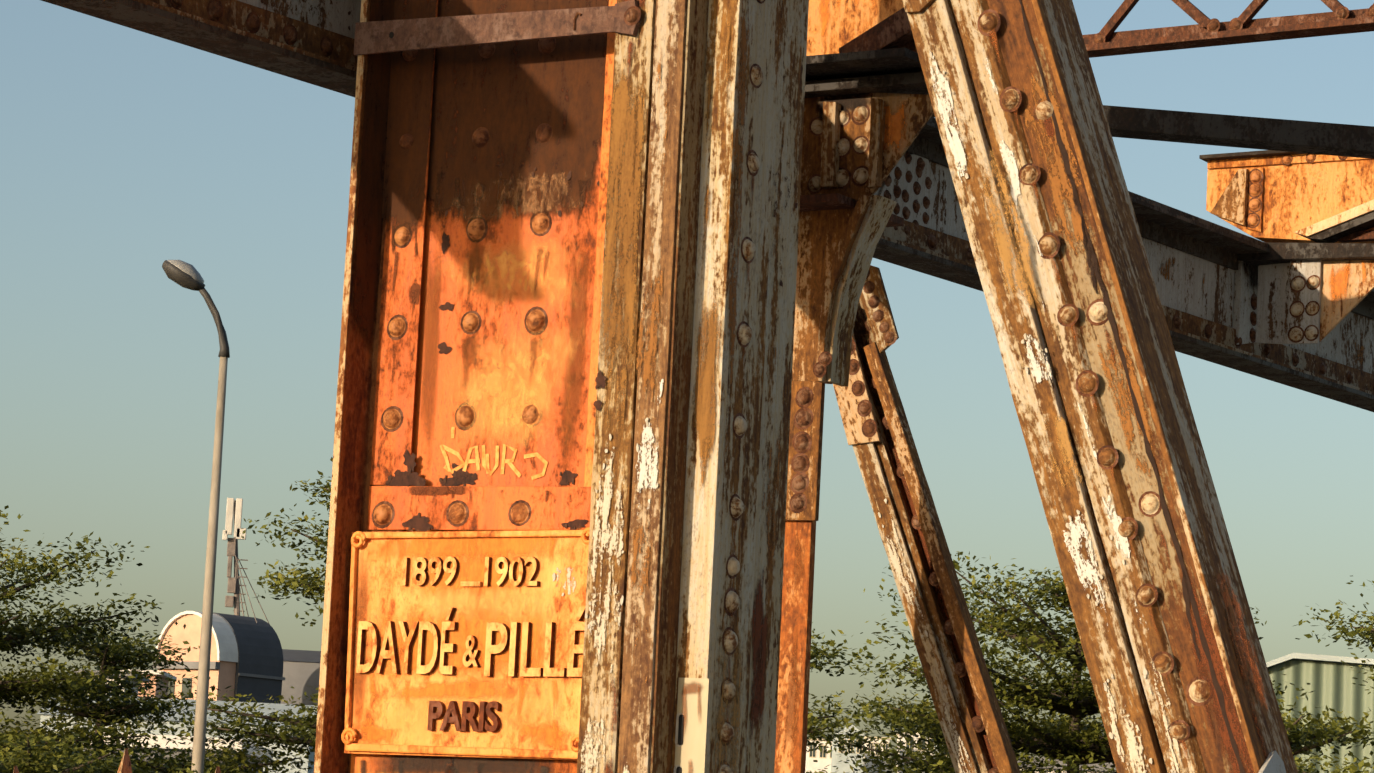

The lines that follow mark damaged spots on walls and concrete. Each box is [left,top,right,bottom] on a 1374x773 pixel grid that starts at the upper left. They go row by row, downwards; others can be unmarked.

peeling [929,51,969,183]
rust [982,154,1039,307]
peeling [1000,138,1043,262]
rust [1024,71,1097,281]
rust [392,232,475,434]
spalling [594,370,607,411]
peeling [1021,333,1052,385]
rust [1045,416,1081,486]
rust [1091,330,1156,486]
peeling [878,498,928,638]
peeling [1102,495,1131,565]
rust [386,615,542,704]